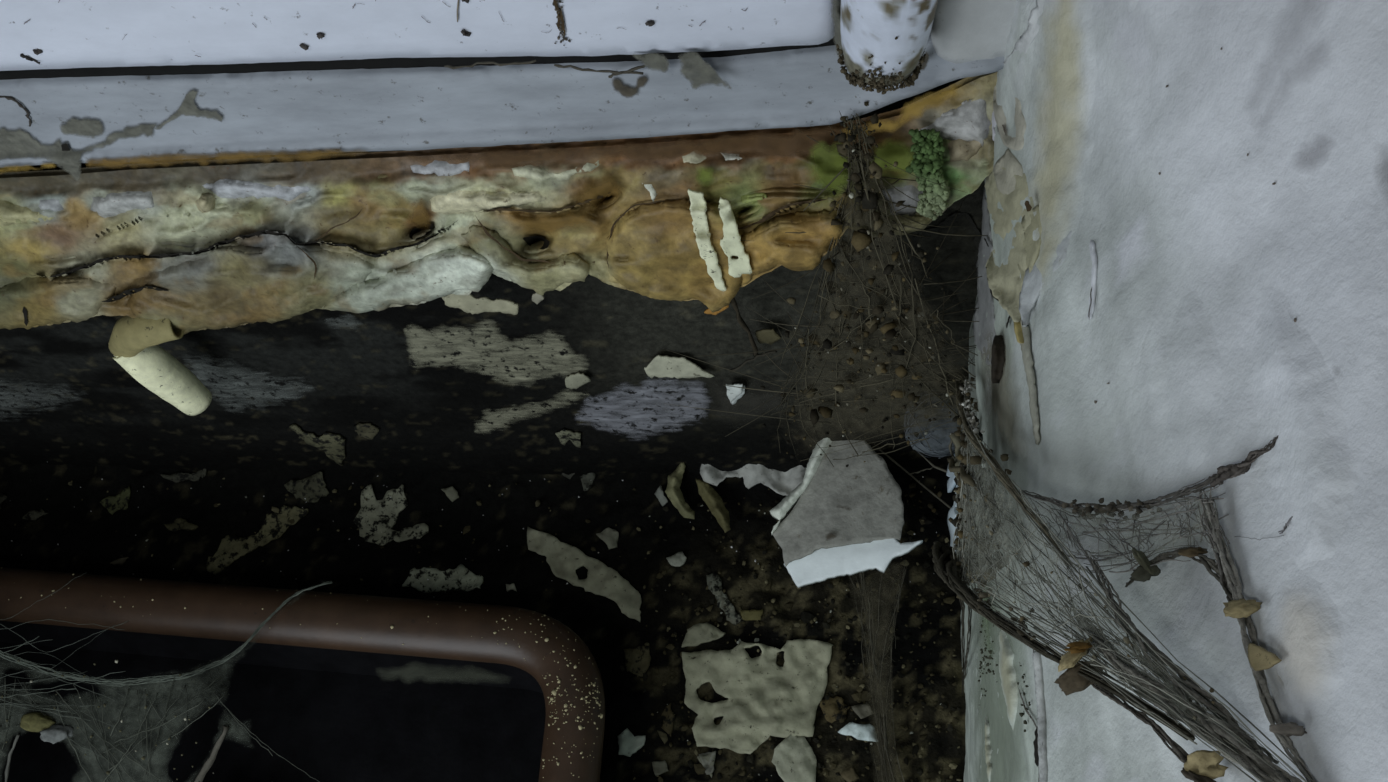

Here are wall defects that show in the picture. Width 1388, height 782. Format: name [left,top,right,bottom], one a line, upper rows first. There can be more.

peeling [0,0,1072,448]
crack [34,192,665,302]
crack [21,307,29,326]
peeling [623,646,651,677]
peeling [661,572,875,782]
peeling [617,728,646,757]
peeling [652,760,668,776]